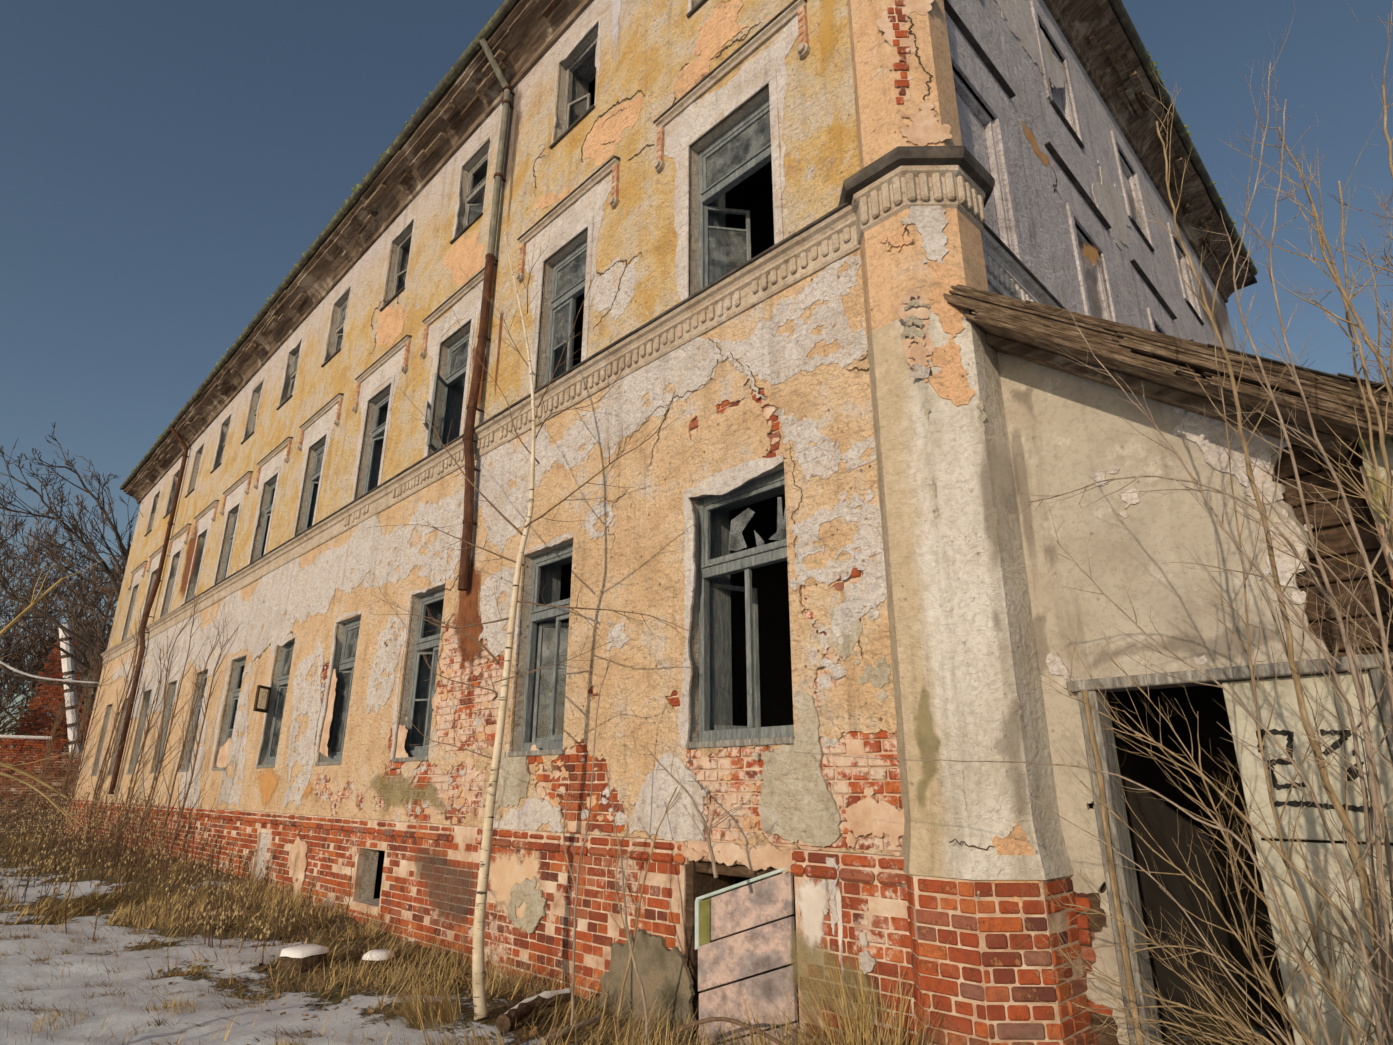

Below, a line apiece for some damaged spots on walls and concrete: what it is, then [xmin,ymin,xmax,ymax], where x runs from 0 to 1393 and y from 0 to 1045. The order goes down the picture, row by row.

flaking render [694,0,748,60]
flaking render [876,0,953,146]
crack [907,16,938,114]
corrosion [472,312,503,408]
flaking render [879,206,987,431]
peeling [113,256,904,856]
flaking render [1172,407,1314,605]
corrosion [453,558,482,705]